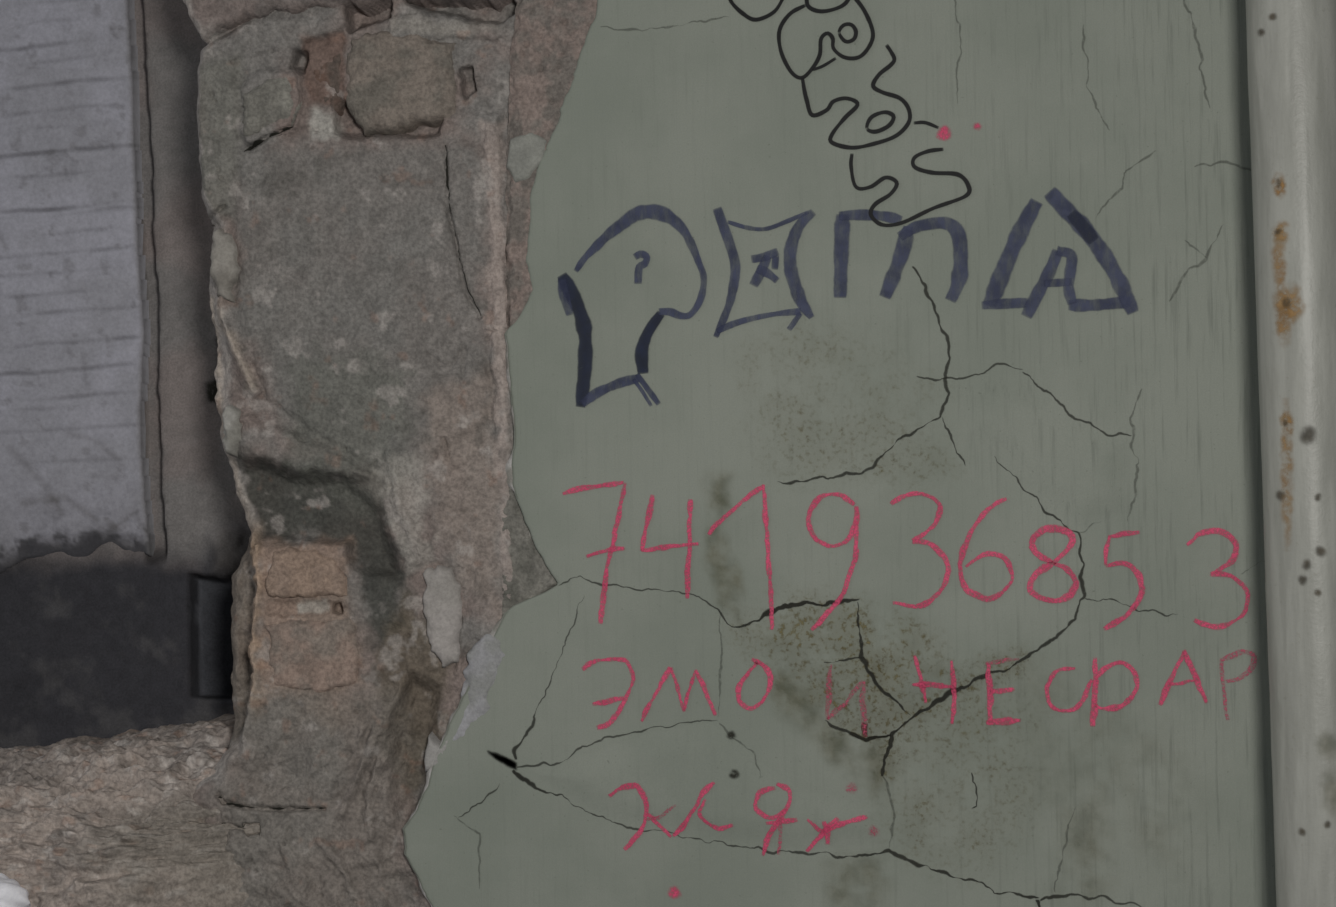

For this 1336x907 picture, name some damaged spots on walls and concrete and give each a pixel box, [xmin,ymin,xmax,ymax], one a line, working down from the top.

spalling [183,0,597,907]
crack [460,266,1172,907]
corrosion [1274,224,1301,333]